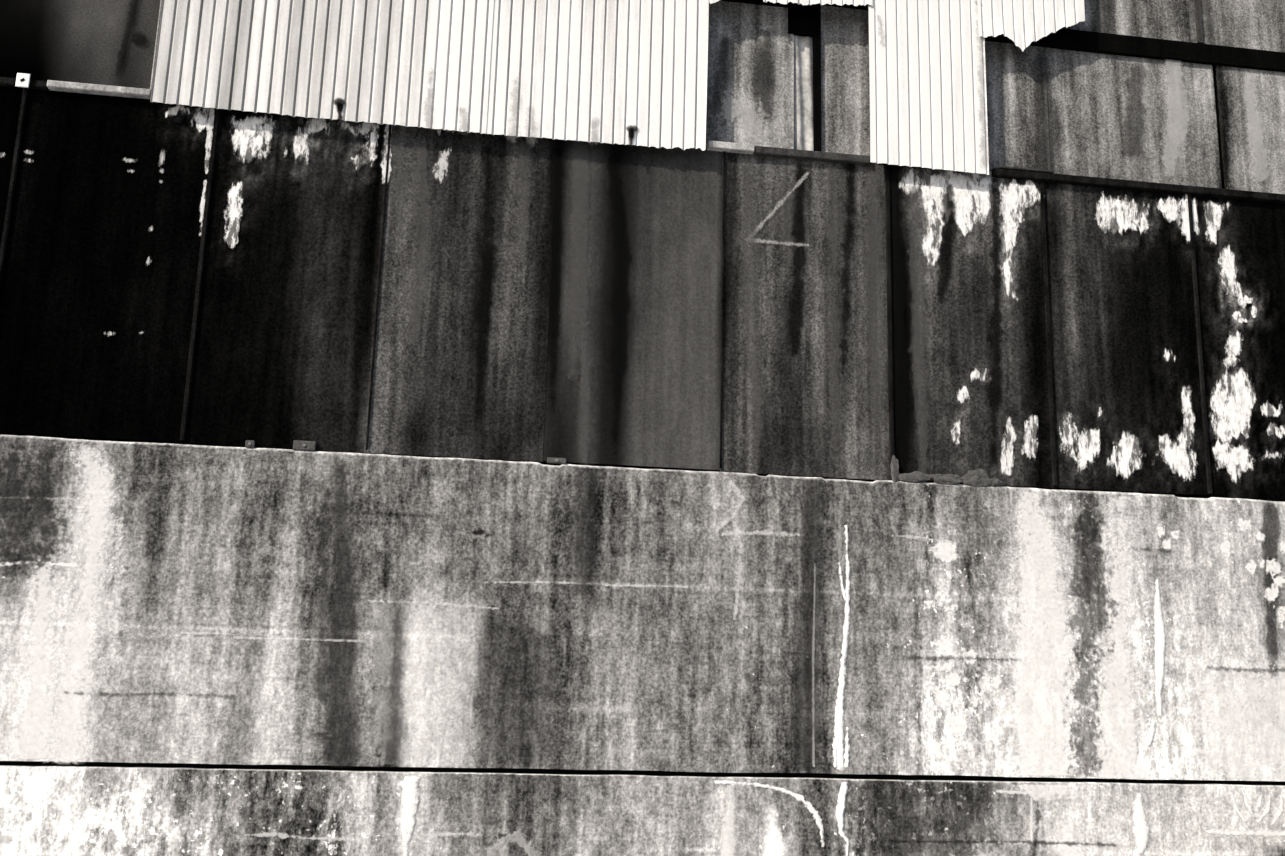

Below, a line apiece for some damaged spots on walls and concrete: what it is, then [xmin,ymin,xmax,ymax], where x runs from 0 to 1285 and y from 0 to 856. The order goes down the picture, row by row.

peeling [233,117,276,162]
peeling [899,168,1040,298]
peeling [1096,194,1285,483]
peeling [1001,415,1038,475]
peeling [1059,409,1141,478]
leakage [0,446,125,763]
leakage [314,464,356,765]
leakage [386,607,401,763]
crack [715,525,850,856]
leakage [1009,492,1165,856]
leakage [1262,504,1280,674]
crack [400,776,419,856]